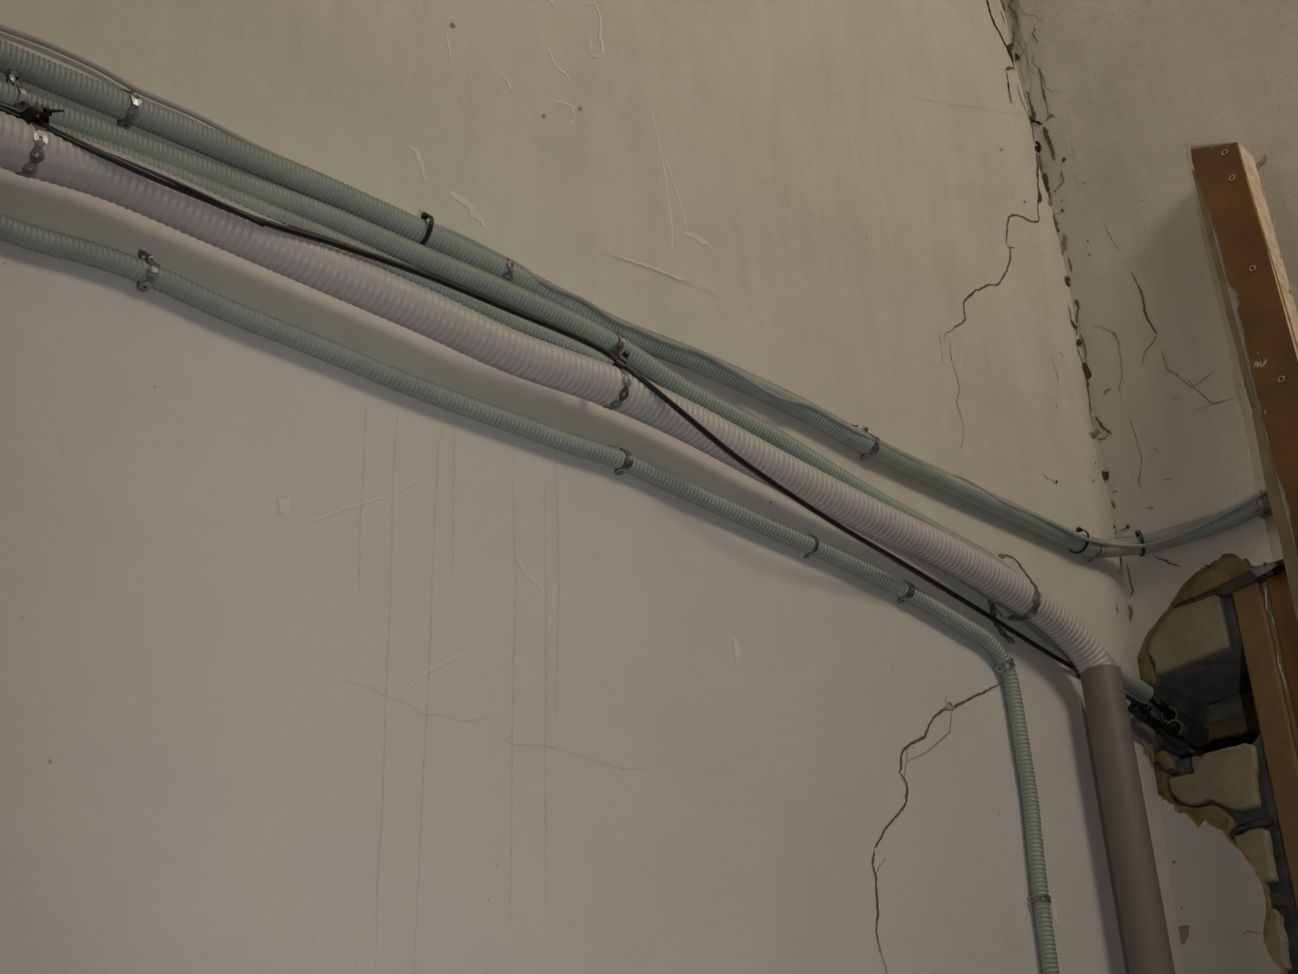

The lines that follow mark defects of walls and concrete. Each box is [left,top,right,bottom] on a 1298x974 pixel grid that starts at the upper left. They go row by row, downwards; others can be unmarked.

crack [938,0,1236,621]
crack [872,683,1001,970]
flaking render [1128,556,1298,974]